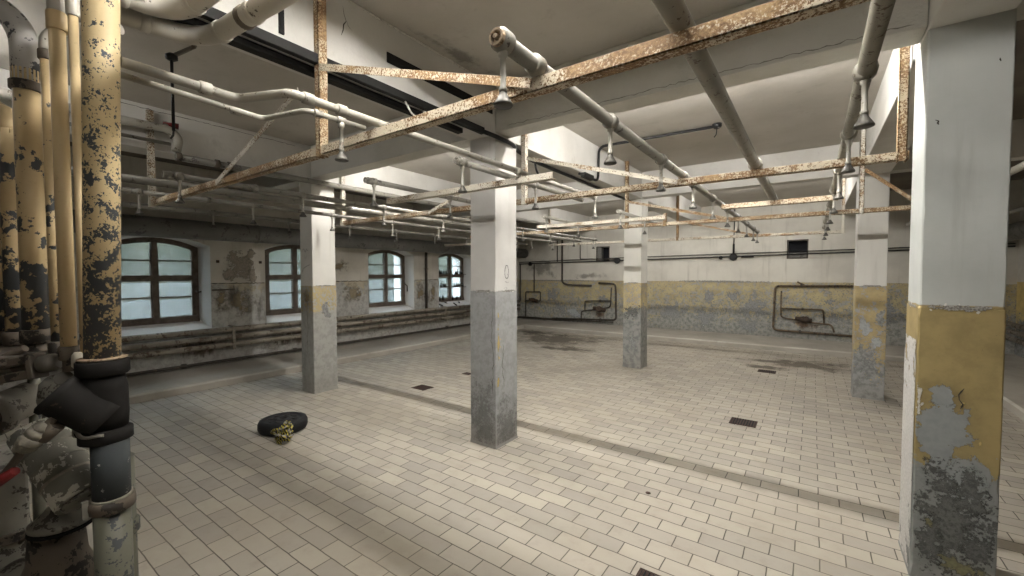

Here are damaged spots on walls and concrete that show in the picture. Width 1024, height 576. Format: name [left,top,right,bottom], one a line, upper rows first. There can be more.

peeling [223,246,257,284]
damp [751,360,844,373]
spalling [857,298,999,576]